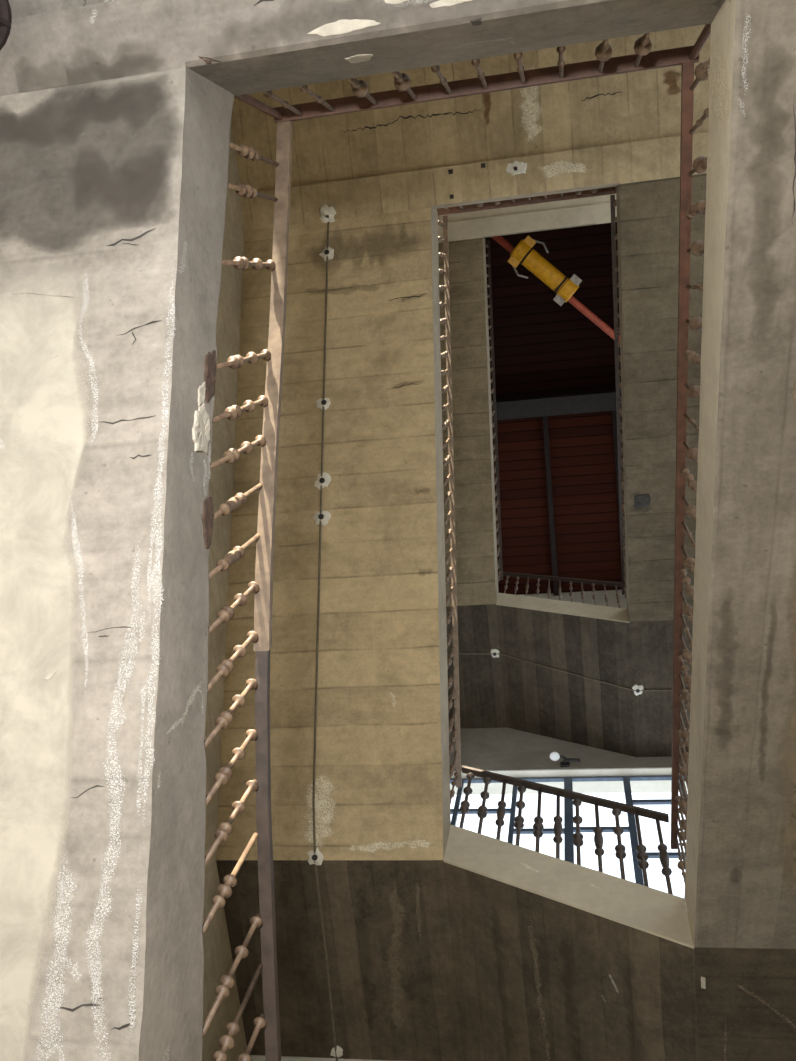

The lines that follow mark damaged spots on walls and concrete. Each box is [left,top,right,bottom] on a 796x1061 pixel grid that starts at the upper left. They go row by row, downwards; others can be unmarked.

peeling [378,0,472,11]
peeling [308,19,381,37]
peeling [345,54,373,63]
crack [340,109,479,133]
leakage [0,84,173,248]
peeling [506,160,586,178]
crack [107,228,156,246]
crack [116,320,162,345]
crack [58,998,130,1030]